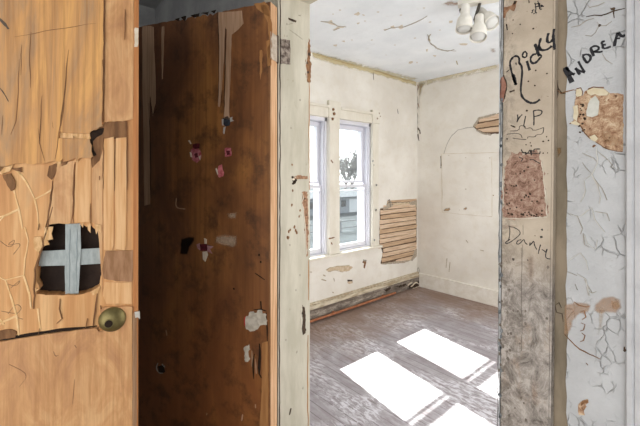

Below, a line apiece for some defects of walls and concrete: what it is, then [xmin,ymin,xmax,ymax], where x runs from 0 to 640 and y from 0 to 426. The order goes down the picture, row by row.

spalling [473,75,507,147]
spalling [569,87,624,152]
peeling [499,150,549,221]
peeling [287,134,310,335]
spalling [374,199,417,265]
crack [554,147,614,365]
spalling [578,399,589,415]